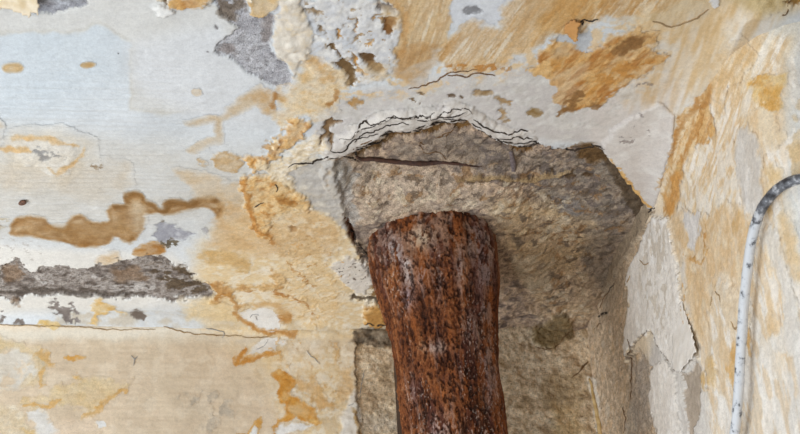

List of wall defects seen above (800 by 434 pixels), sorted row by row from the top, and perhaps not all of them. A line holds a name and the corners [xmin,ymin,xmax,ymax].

spalling [0,0,88,18]
flaking render [151,0,407,110]
water stain [182,83,273,155]
crack [288,108,605,168]
water stain [745,71,800,195]
spalling [0,220,217,326]
water stain [0,155,278,265]
water stain [765,203,800,287]
water stain [763,309,781,340]